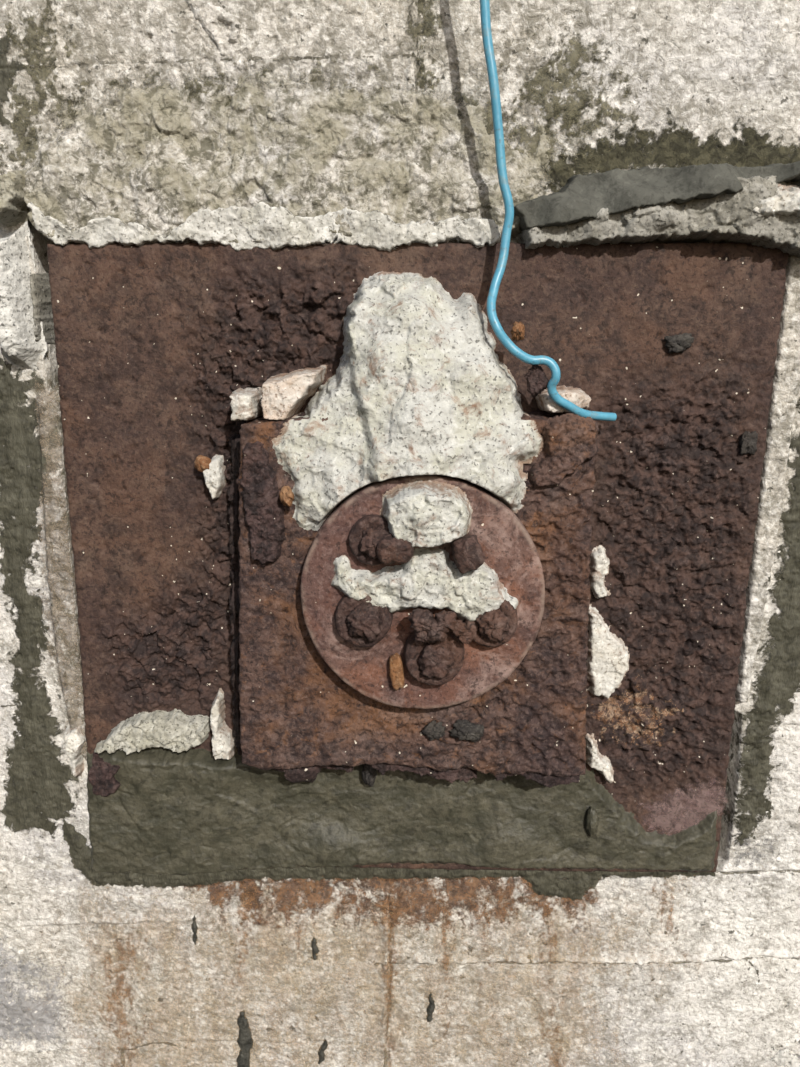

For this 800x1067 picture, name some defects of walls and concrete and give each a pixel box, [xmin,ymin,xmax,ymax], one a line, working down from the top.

crack [16,59,194,70]
crack [220,54,329,62]
crack [363,12,422,93]
spalling [27,200,501,252]
spalling [515,175,800,258]
rust [524,365,549,397]
spalling [271,271,544,621]
rust [227,434,242,756]
rust [591,686,684,747]
peeling [736,830,774,866]
rust [184,876,598,1023]
crack [374,911,800,1067]